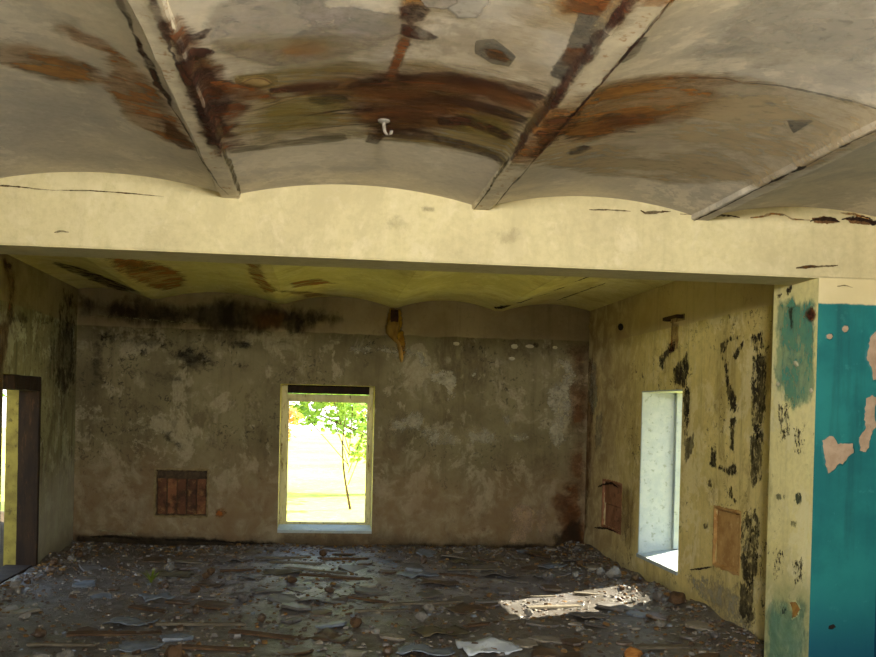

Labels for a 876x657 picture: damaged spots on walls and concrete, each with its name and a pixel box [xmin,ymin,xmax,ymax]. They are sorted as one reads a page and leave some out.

corrosion [385,0,438,82]
peeling [475,39,515,66]
corrosion [6,0,278,194]
corrosion [474,0,674,209]
crack [0,185,162,197]
leakage [107,264,335,333]
crack [796,265,848,287]
peeling [865,329,876,382]
mould [659,344,694,462]
mould [720,329,767,488]
peeling [821,393,876,474]
mould [739,509,760,628]